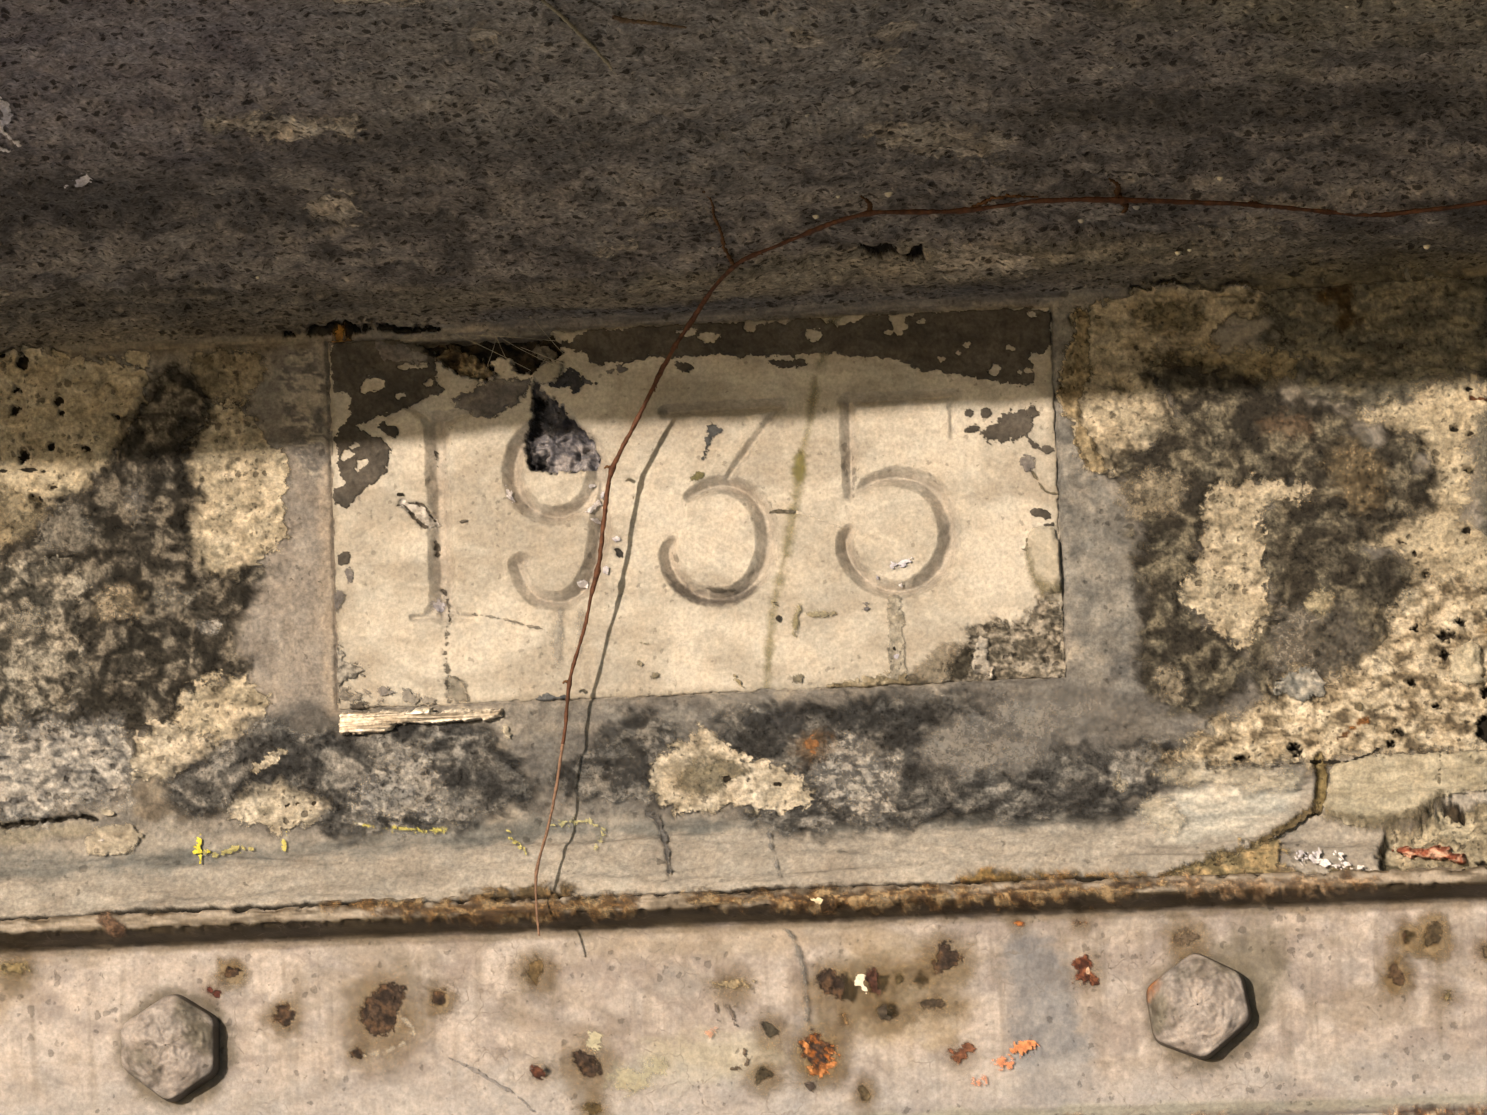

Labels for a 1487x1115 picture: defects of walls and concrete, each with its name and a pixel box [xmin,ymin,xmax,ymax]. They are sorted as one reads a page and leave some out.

spalling [330,280,1304,508]
water stain [1111,266,1487,715]
water stain [0,362,265,829]
crack [0,814,98,829]
spalling [226,779,331,837]
spalling [648,723,814,817]
water stain [808,733,899,820]
crack [1157,748,1380,878]
corrosion [320,892,637,929]
corrosion [686,867,1379,926]
corrosion [348,975,455,1059]
corrosion [762,937,970,1105]